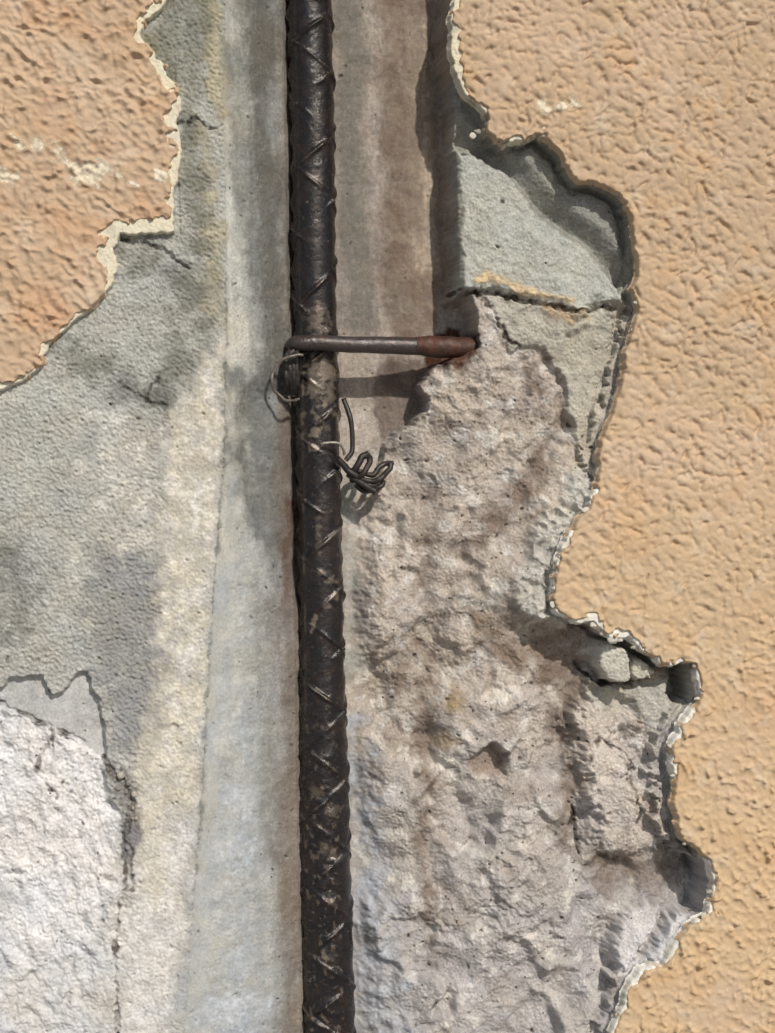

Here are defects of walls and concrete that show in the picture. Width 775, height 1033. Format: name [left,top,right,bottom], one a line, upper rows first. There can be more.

peeling [0,0,227,1033]
rust [333,0,374,328]
rust [374,0,480,439]
crack [446,288,612,347]
spalling [361,0,716,1033]
crack [102,755,134,953]